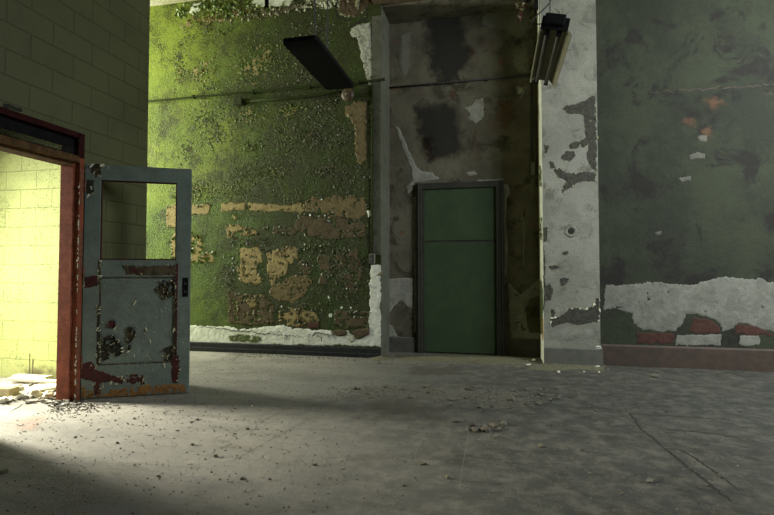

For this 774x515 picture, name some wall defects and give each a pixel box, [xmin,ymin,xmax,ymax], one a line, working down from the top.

spalling [25,0,439,408]
spalling [464,98,484,124]
spalling [508,84,774,345]